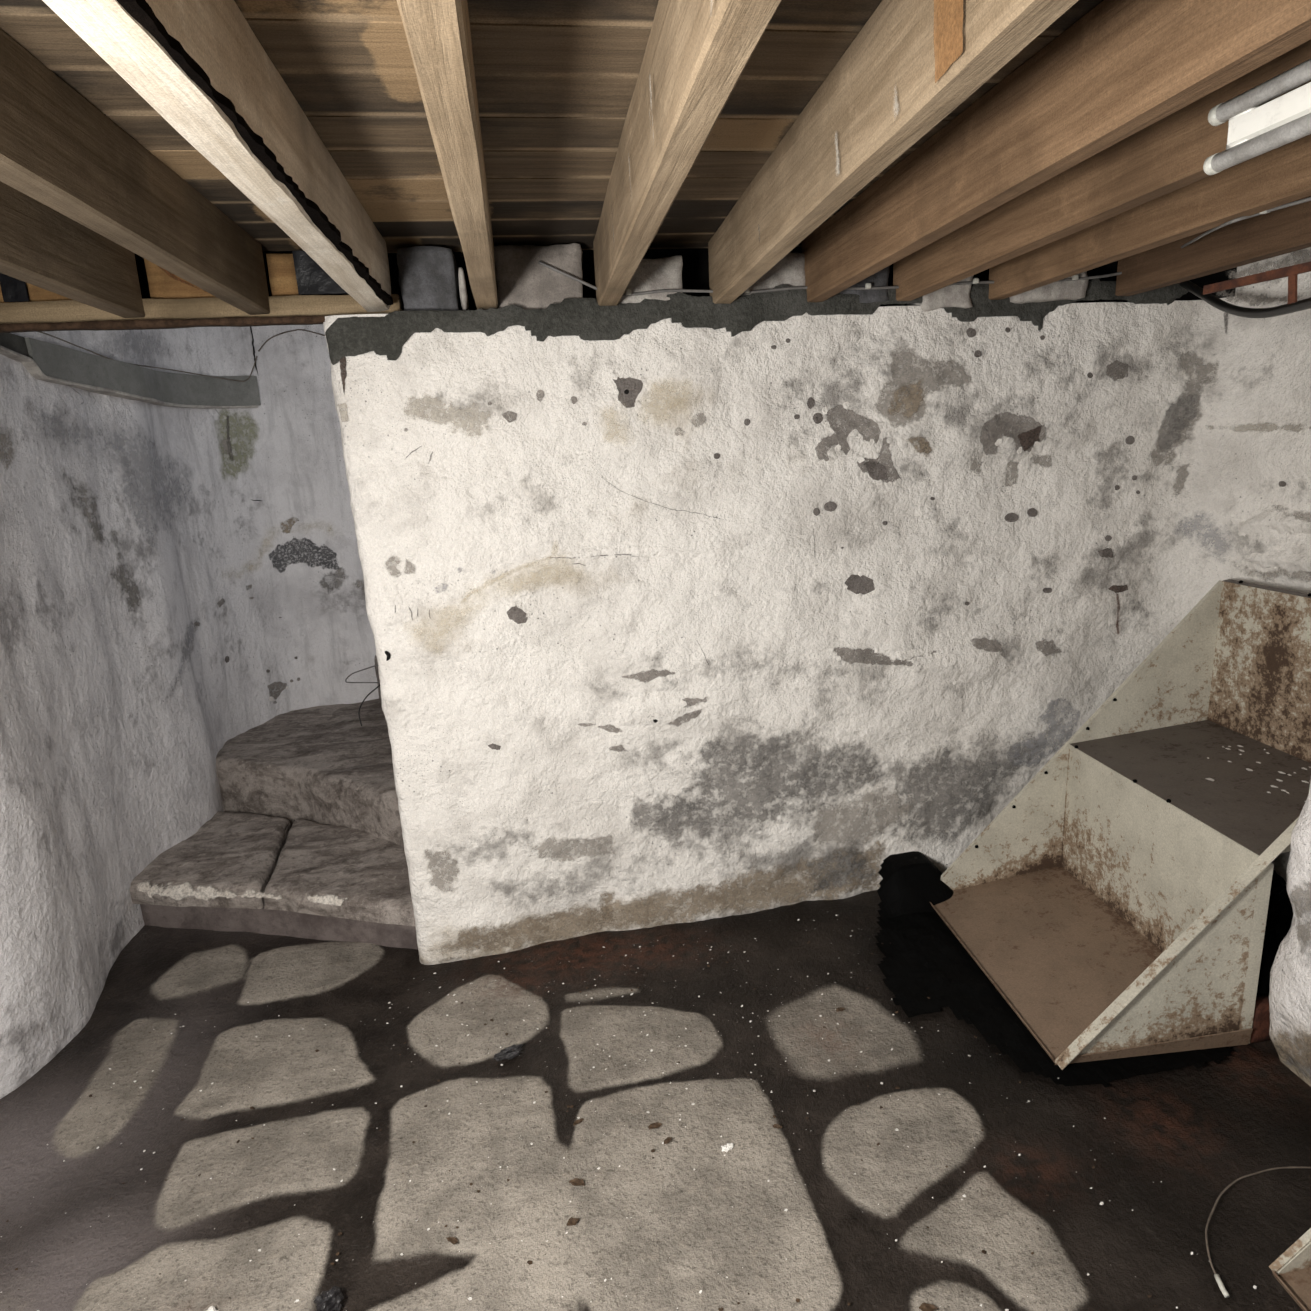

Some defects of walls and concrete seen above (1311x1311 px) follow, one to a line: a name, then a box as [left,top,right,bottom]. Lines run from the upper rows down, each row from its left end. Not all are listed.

peeling [794,397,902,489]
peeling [980,412,1051,459]
water stain [425,850,459,891]
water stain [443,700,1080,951]